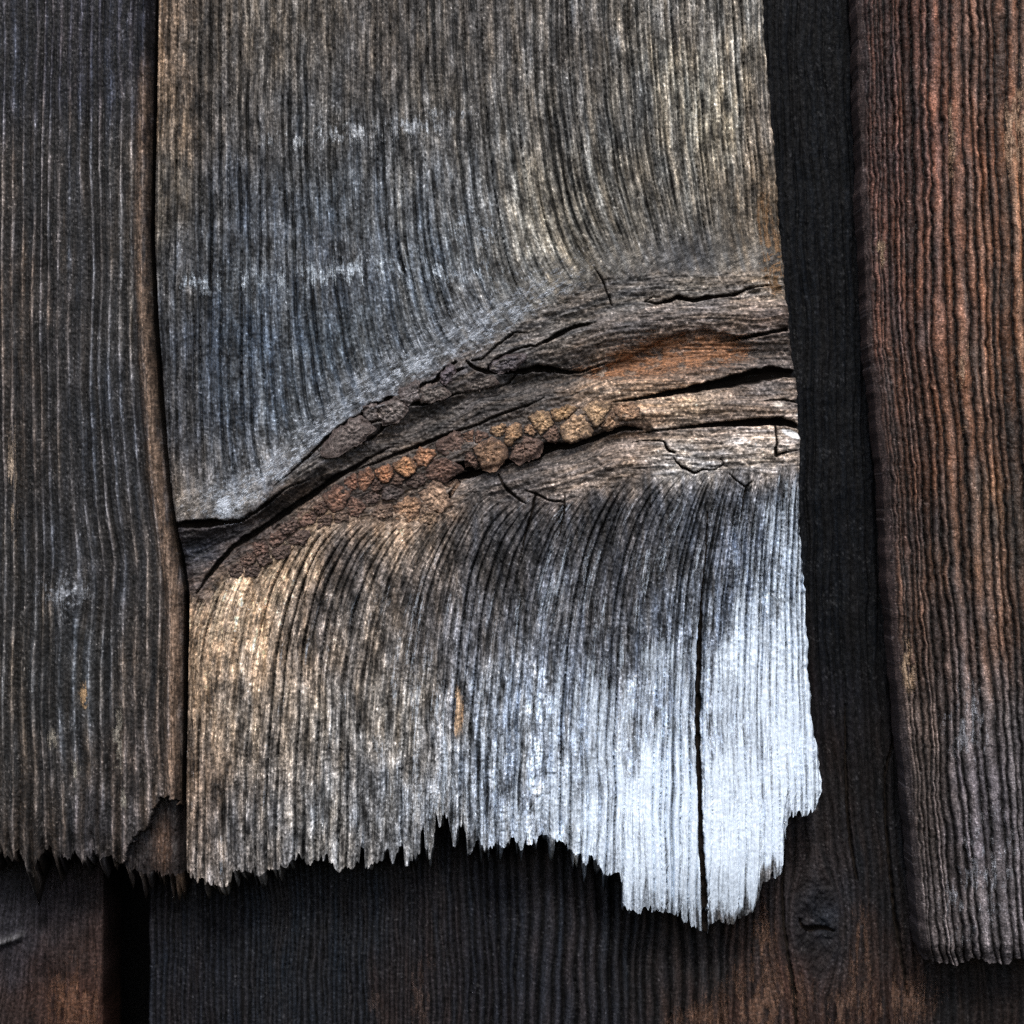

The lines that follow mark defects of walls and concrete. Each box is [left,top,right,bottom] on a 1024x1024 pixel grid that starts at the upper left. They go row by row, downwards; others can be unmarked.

crack [180,269,612,593]
crack [437,367,797,564]
crack [645,286,763,305]
crack [720,328,786,343]
crack [695,512,708,932]